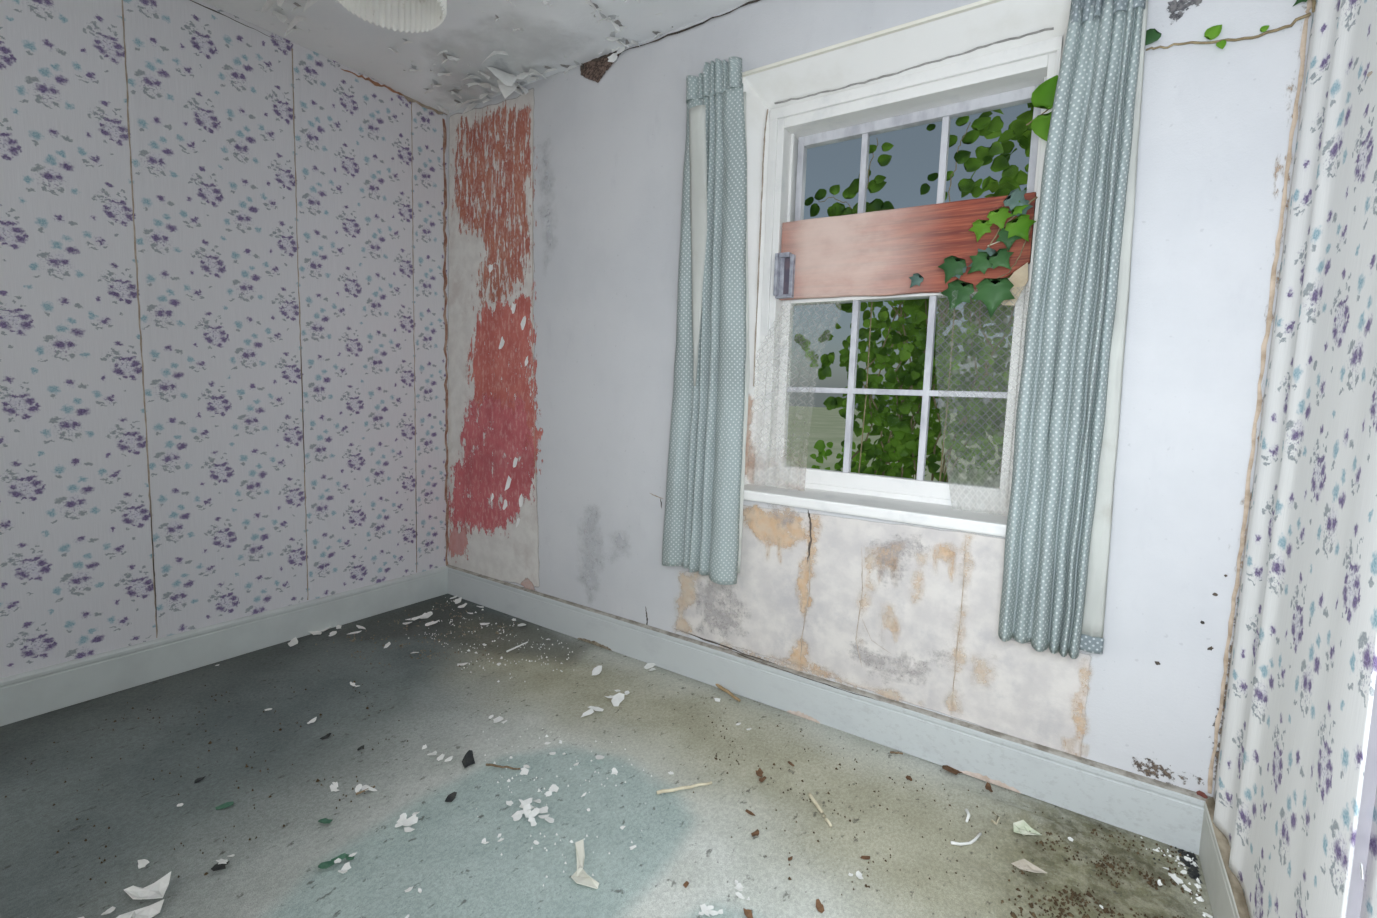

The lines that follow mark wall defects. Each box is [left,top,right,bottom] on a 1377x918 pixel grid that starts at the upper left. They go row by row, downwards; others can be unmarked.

flaking render [389,0,674,590]
peeling [753,109,768,386]
flaking render [676,505,1091,757]
water stain [1132,597,1239,786]